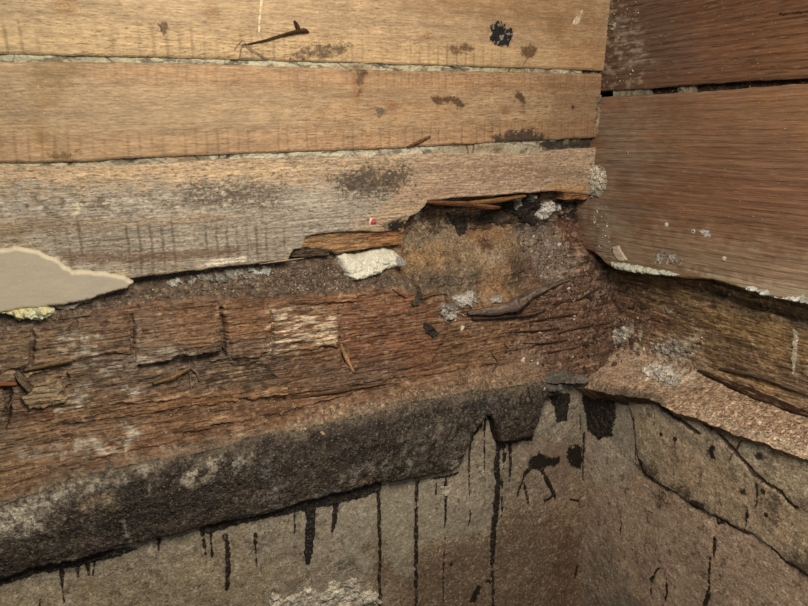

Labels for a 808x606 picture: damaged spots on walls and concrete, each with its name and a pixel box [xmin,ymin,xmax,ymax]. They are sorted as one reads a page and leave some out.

damp [336,164,416,200]
spalling [556,192,588,200]
crack [661,407,700,435]
crack [638,458,677,493]
crack [704,432,795,534]
damp [312,482,582,606]